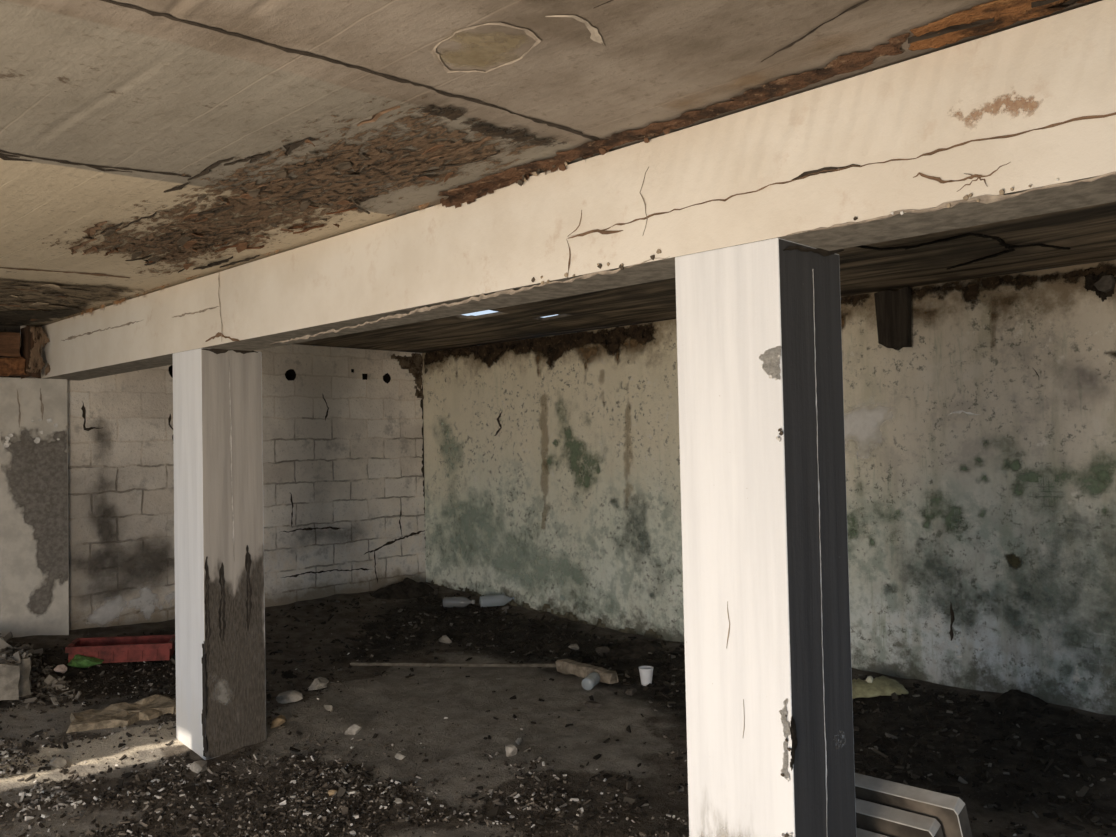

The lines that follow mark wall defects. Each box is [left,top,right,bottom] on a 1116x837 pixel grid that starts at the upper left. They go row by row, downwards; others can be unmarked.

spalling [43,97,567,276]
water stain [545,15,605,46]
rust [418,0,1091,208]
crack [566,112,1116,279]
peeling [0,279,144,326]
flaking render [891,261,1116,309]
peeling [1,418,68,615]
water stain [201,545,266,759]
mould [545,407,600,489]
crack [783,233,1070,837]
mould [988,519,1116,676]
mould [1004,457,1116,508]